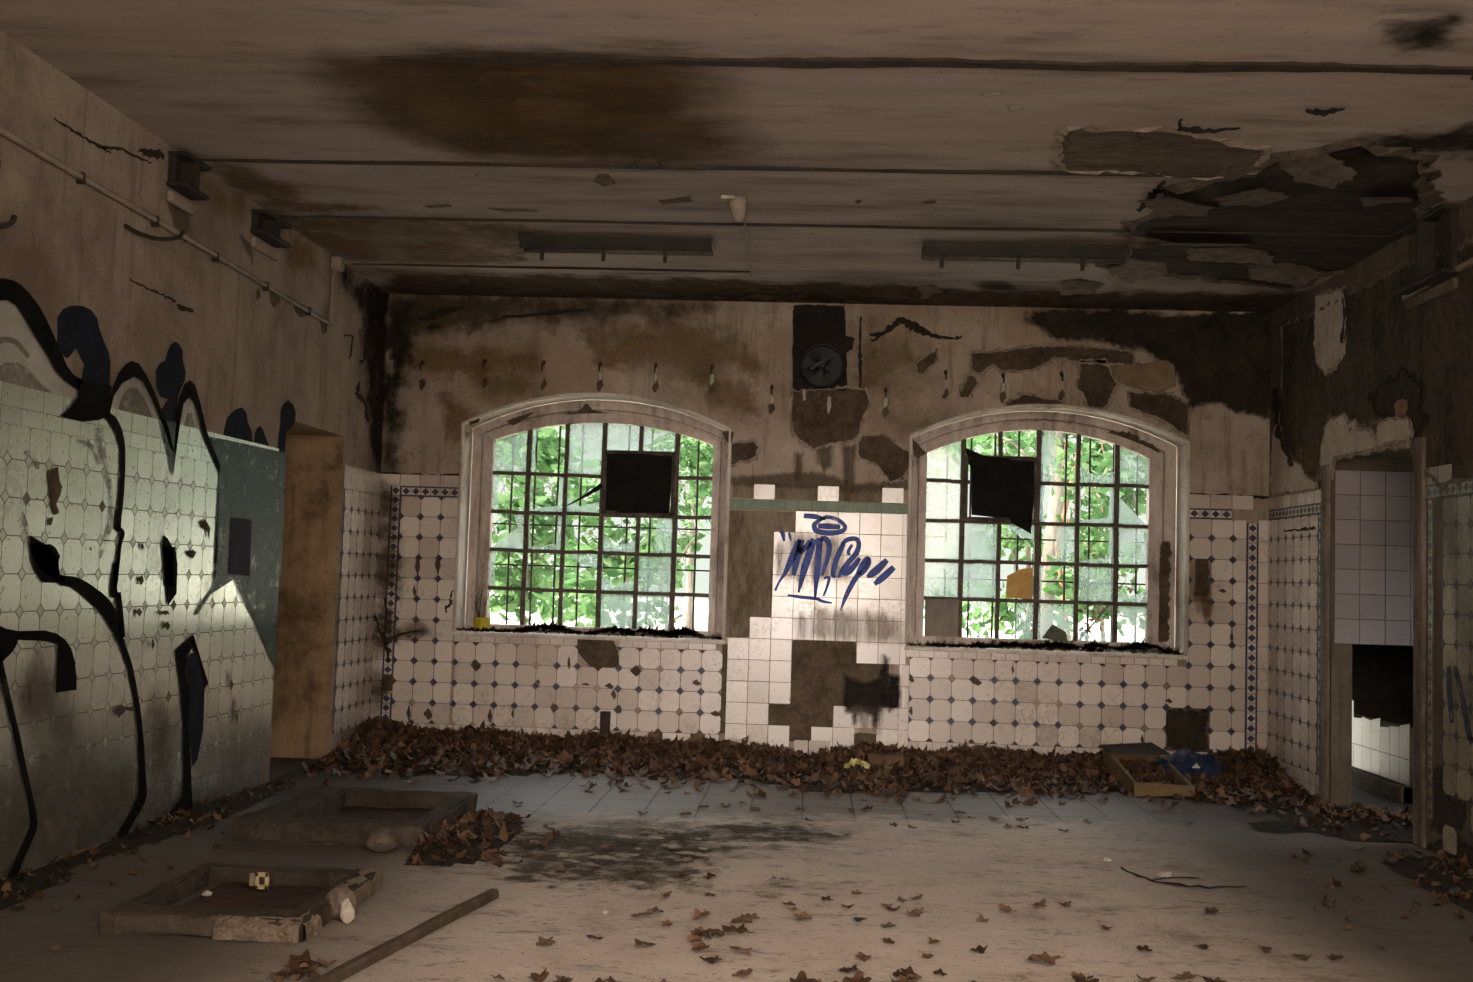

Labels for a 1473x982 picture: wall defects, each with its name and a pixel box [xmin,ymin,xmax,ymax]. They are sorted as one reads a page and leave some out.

water stain [1387,15,1461,50]
water stain [339,61,735,162]
water stain [1363,122,1473,161]
water stain [168,202,189,241]
peeling [1049,125,1473,498]
water stain [214,165,1306,646]
peeling [768,384,926,502]
peeling [942,342,1191,440]
peeling [648,431,818,742]
peeling [1158,541,1172,642]
peeling [567,639,641,731]
peeling [769,640,913,742]